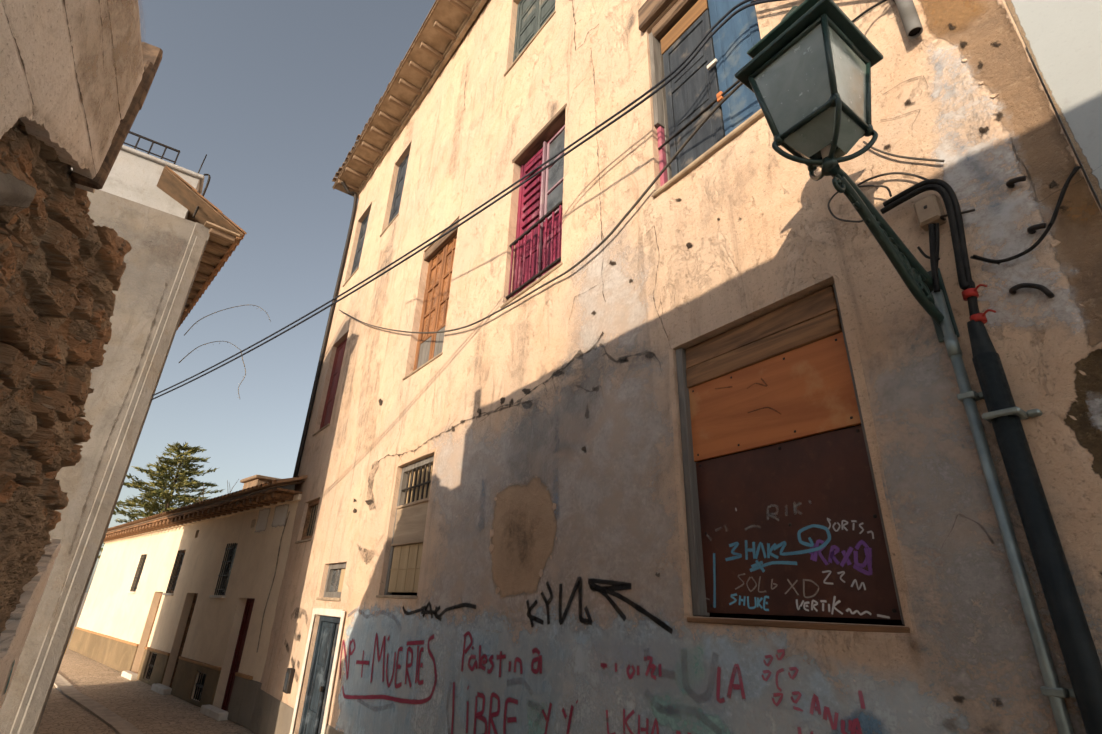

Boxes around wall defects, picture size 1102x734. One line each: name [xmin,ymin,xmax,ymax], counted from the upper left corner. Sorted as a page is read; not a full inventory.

crack [1012,143,1049,197]
spalling [920,0,1102,478]
spalling [500,388,532,409]
crack [378,226,671,466]
spalling [489,477,557,597]